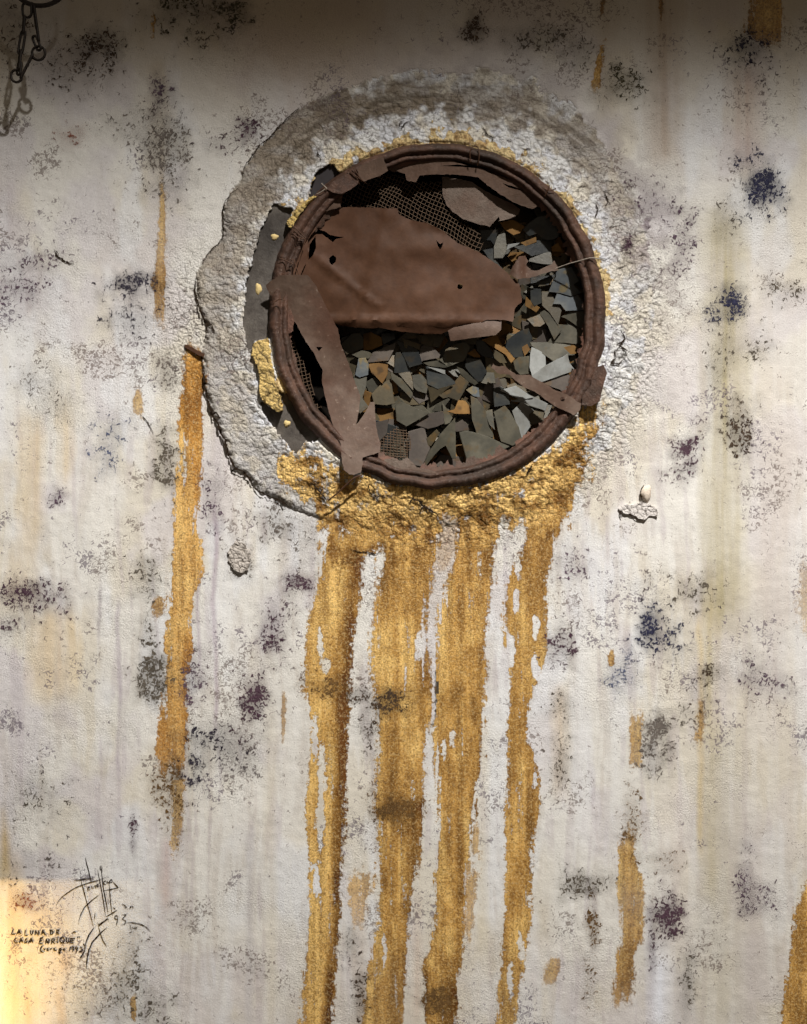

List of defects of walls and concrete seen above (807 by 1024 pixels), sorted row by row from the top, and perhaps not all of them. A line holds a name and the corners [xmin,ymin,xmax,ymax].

flaking render [287,195,316,227]
rust [301,207,544,363]
rust [328,119,613,316]
leakage [700,274,802,458]
leakage [713,144,790,235]
rust [151,339,209,850]
leakage [147,490,411,846]
rust [276,403,607,1024]
leakage [600,570,726,695]
rust [611,828,645,1006]
leakage [558,663,724,1016]
rust [781,880,807,1024]